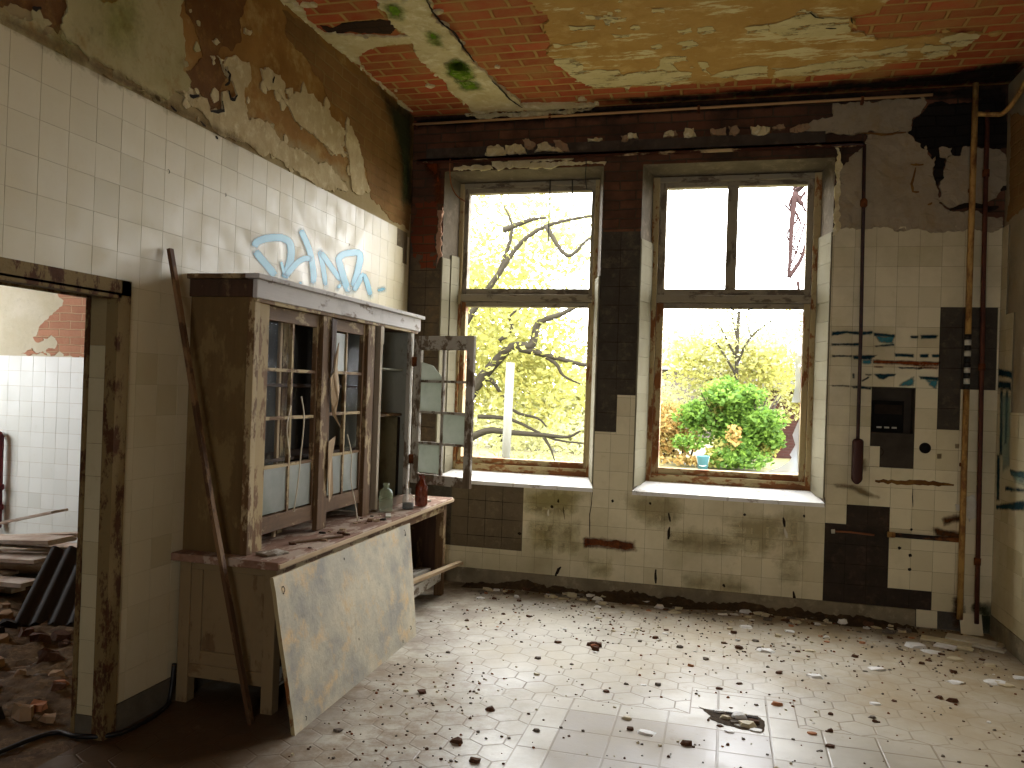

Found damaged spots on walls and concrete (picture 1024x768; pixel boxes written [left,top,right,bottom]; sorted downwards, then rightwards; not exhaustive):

crack [426,0,474,62]
crack [492,80,523,108]
flaking render [0,0,1007,476]